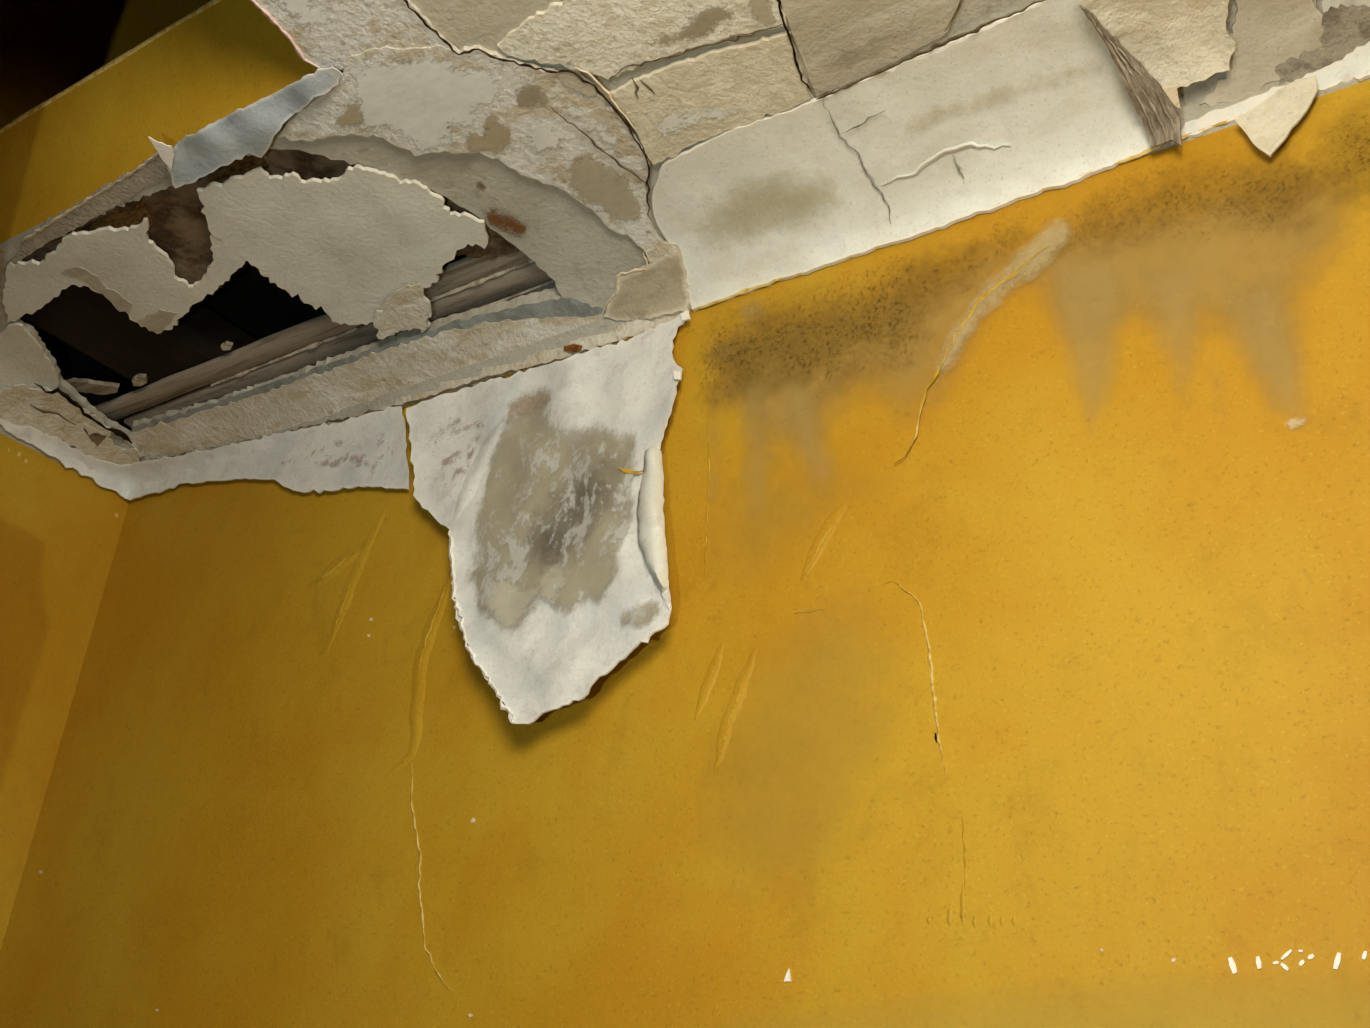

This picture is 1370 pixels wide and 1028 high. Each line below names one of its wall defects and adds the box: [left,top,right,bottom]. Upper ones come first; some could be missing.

crack [403,0,1045,224]
peeling [1079,5,1182,148]
flaking render [1199,0,1324,157]
damp [1044,188,1325,333]
peeling [0,0,962,725]
damp [729,278,988,427]
damp [471,391,635,626]